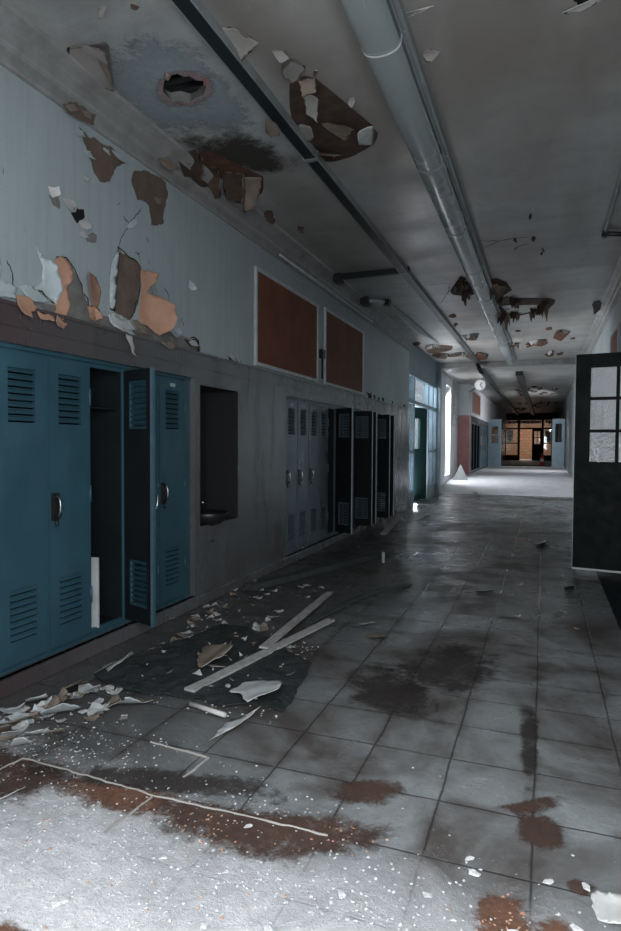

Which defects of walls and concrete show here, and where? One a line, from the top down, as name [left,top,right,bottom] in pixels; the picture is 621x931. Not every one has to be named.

leakage [111,38,282,172]
peeling [271,50,378,162]
peeling [63,101,263,226]
peeling [48,186,97,243]
peeling [0,247,201,357]
peeling [489,278,576,357]
rust [0,748,386,861]
rust [327,780,406,804]
rust [500,797,564,850]
rust [0,923,26,931]
rust [475,894,570,931]